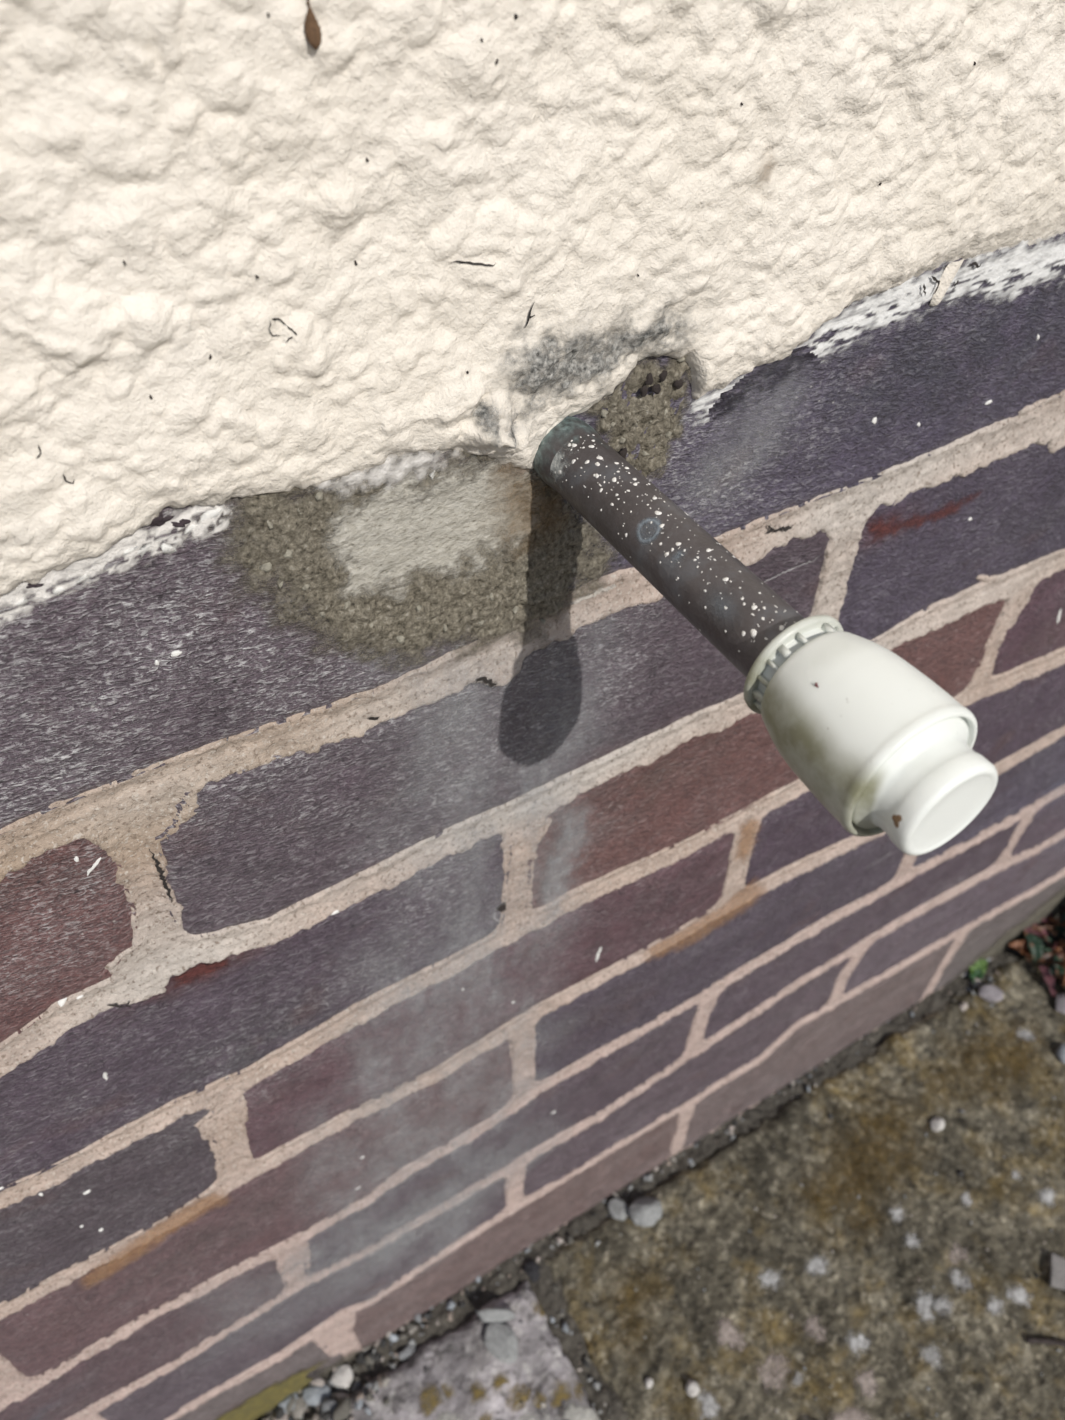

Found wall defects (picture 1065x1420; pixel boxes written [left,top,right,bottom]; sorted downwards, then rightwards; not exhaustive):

spalling [0,401,615,666]
spalling [587,357,691,477]